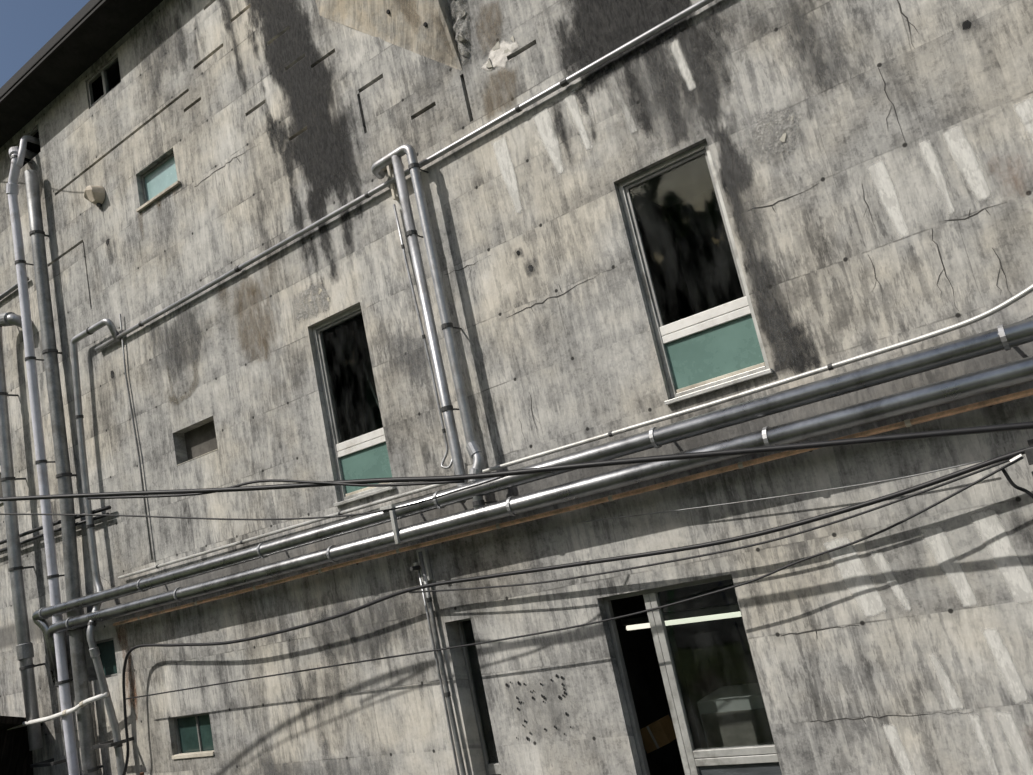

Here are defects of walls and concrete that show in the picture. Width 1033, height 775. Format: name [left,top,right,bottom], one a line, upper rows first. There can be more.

leakage [219,0,246,91]
spalling [481,36,518,70]
crack [878,68,906,143]
leakage [245,0,362,291]
leakage [493,137,522,213]
leakage [534,0,820,373]
crack [748,184,817,213]
crack [506,267,615,318]
crack [932,202,1007,311]